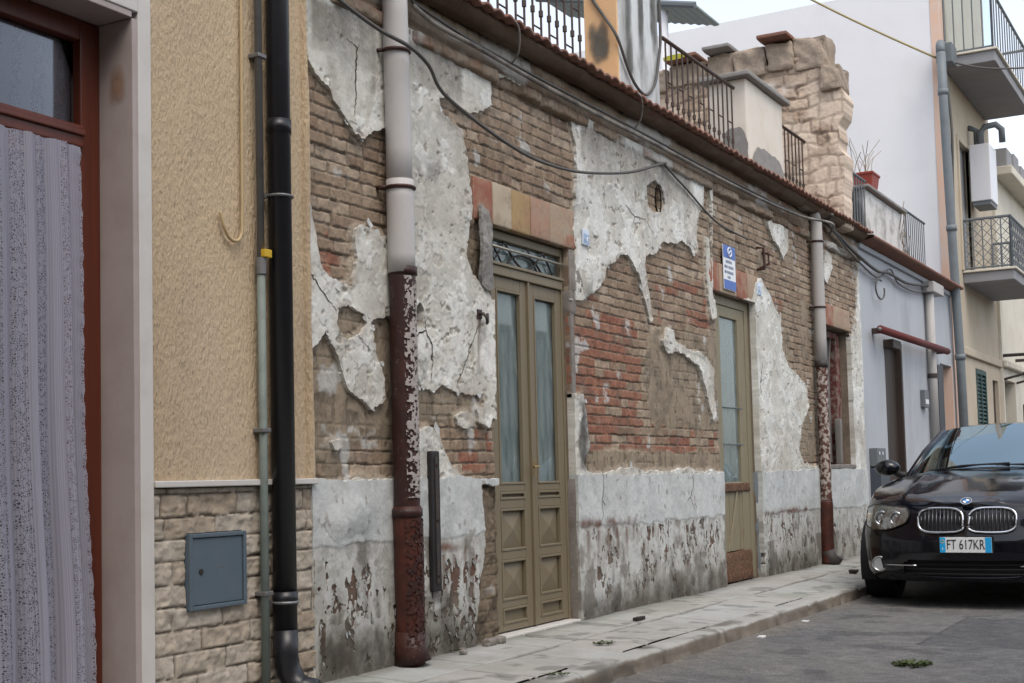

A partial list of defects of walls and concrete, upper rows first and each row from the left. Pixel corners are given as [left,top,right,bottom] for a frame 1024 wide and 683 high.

crack [346,38,360,106]
leakage [589,25,608,61]
spalling [308,68,387,291]
spalling [440,78,577,226]
spalling [647,181,664,214]
spalling [313,306,394,481]
spalling [404,275,500,654]
spalling [467,189,857,473]
peeling [317,561,396,669]
peeling [592,520,719,598]